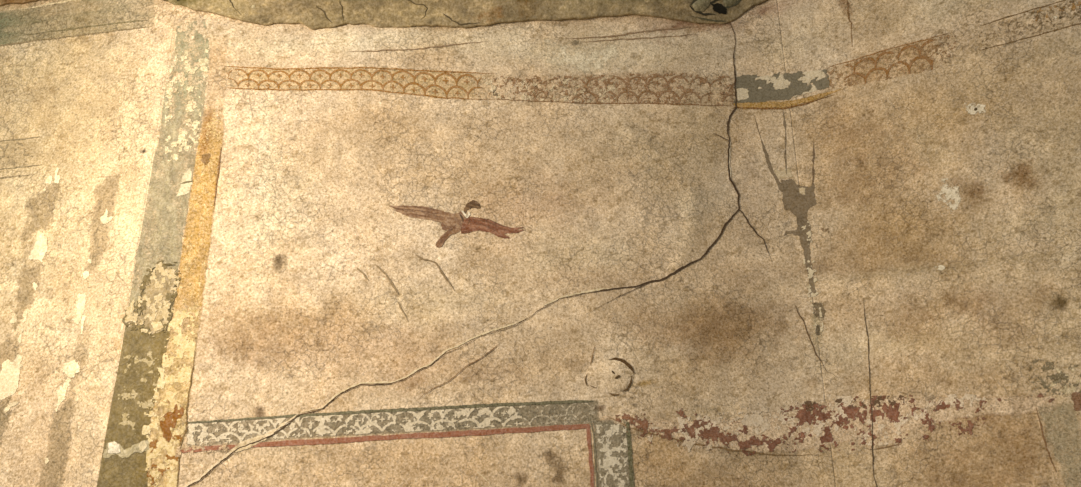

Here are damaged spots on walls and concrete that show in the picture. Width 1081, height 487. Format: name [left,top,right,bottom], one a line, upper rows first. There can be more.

peeling [737,88,749,101]
peeling [756,70,826,97]
crack [184,24,773,487]
flaking render [103,260,199,487]
peeling [615,394,1001,456]